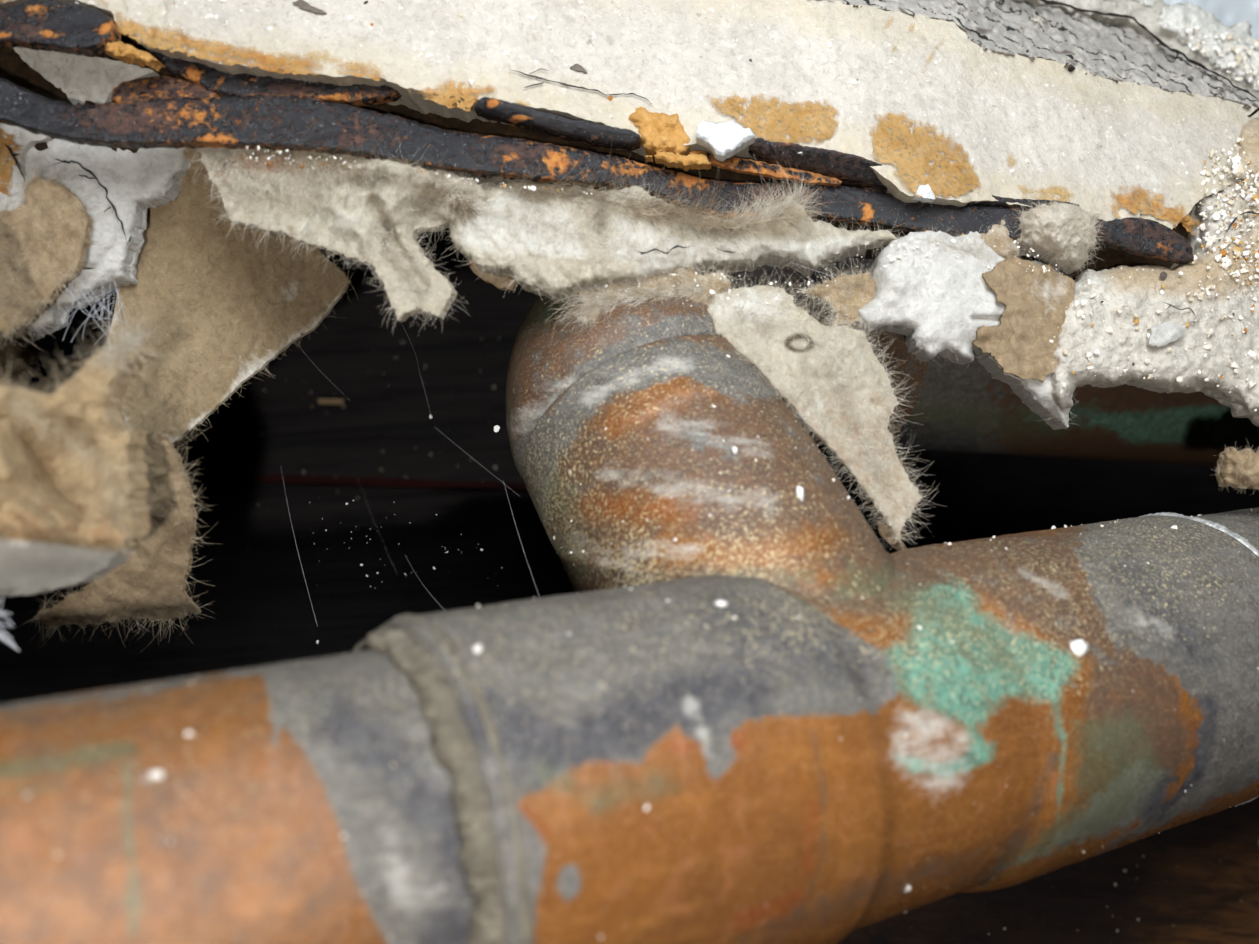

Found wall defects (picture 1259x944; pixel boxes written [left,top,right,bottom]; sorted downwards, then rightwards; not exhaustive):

corrosion [105,19,326,76]
corrosion [0,129,19,197]
corrosion [338,64,380,81]
corrosion [422,80,494,112]
corrosion [629,107,711,171]
peeling [689,121,842,186]
corrosion [711,95,838,143]
corrosion [870,113,980,198]
flaking render [913,184,935,203]
peeling [967,195,1079,210]
corrosion [1113,187,1196,235]
peeling [469,260,518,292]